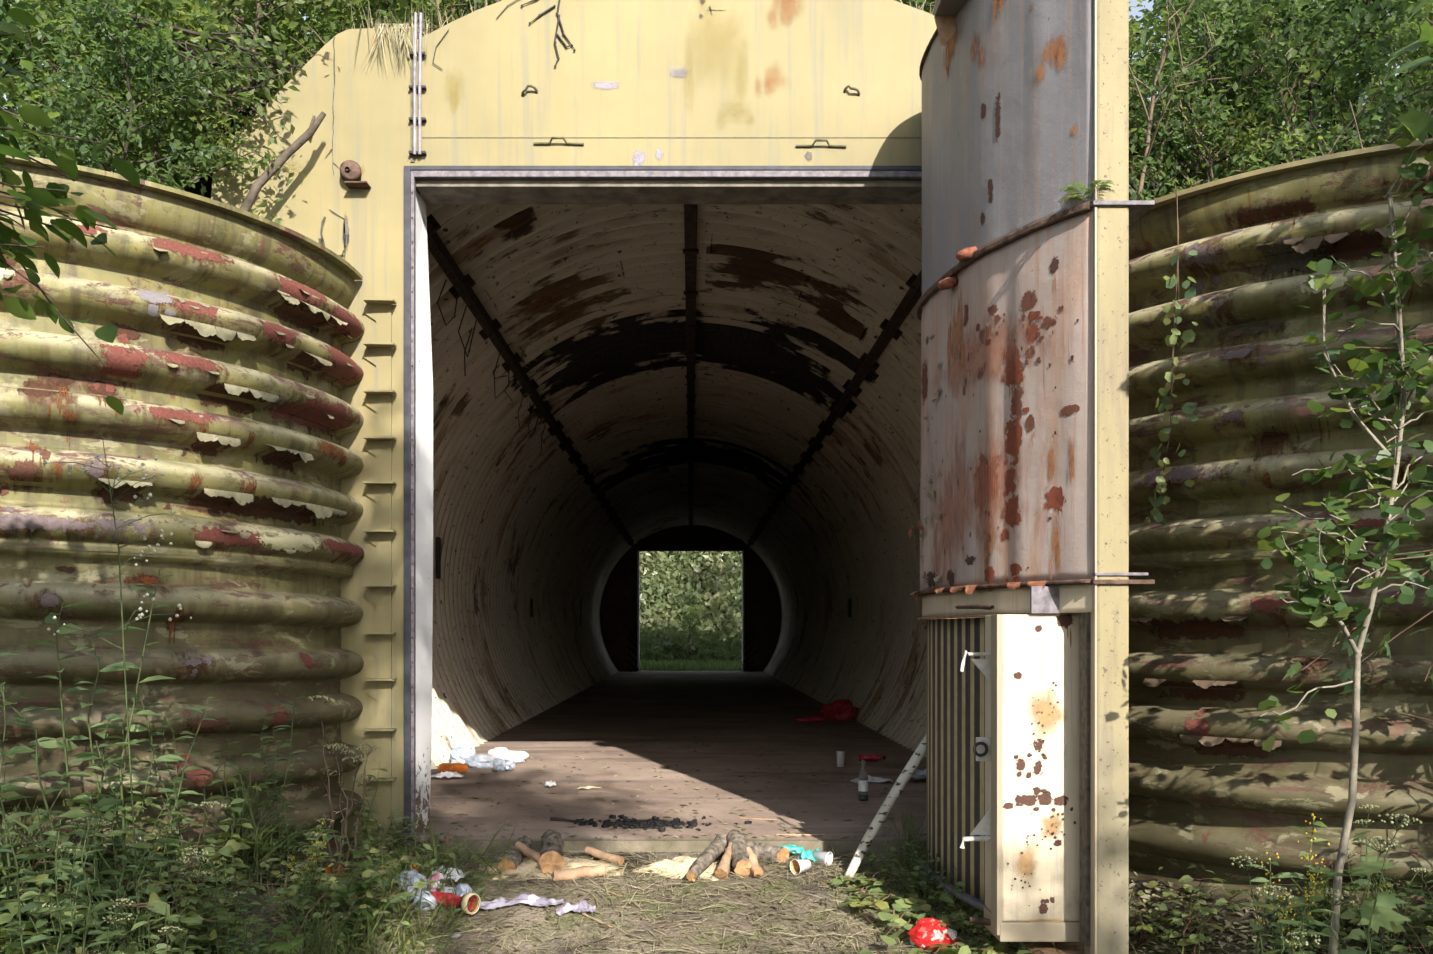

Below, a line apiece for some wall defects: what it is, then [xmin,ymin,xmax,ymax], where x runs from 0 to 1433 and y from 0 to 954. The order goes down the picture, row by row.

corrosion [946,30,984,72]
corrosion [1036,36,1066,81]
peeling [0,268,15,280]
peeling [1248,227,1401,295]
peeling [134,289,256,351]
peeling [269,294,348,333]
peeling [198,382,279,415]
peeling [182,432,241,457]
corrosion [908,256,1080,592]
peeling [0,453,347,555]
corrosion [1035,614,1074,644]
corrosion [1003,676,1076,922]